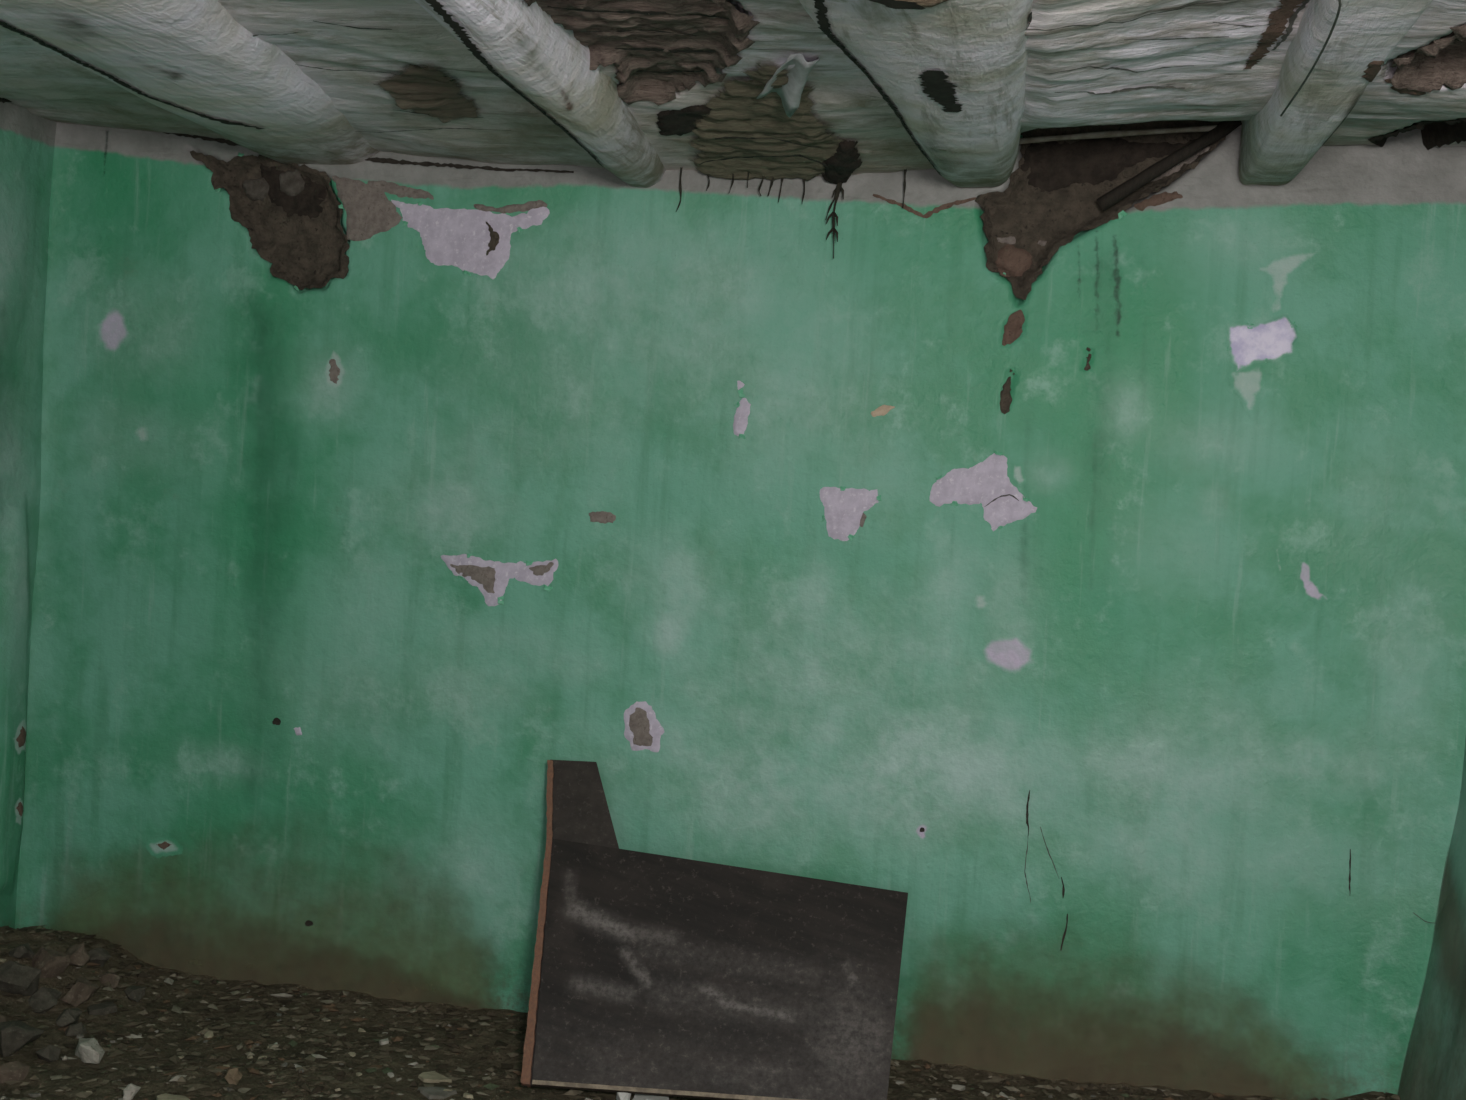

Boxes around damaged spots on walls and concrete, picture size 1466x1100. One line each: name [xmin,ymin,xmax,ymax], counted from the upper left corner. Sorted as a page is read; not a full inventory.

crack [0,21,265,146]
crack [253,32,388,73]
crack [355,0,603,173]
flaking render [1362,24,1466,96]
flaking render [190,150,550,291]
flaking render [873,120,1226,346]
peeling [1227,243,1327,421]
peeling [820,486,881,541]
peeling [930,451,1037,531]
peeling [441,554,558,606]
leakage [54,867,487,1010]
leakage [908,969,1317,1100]